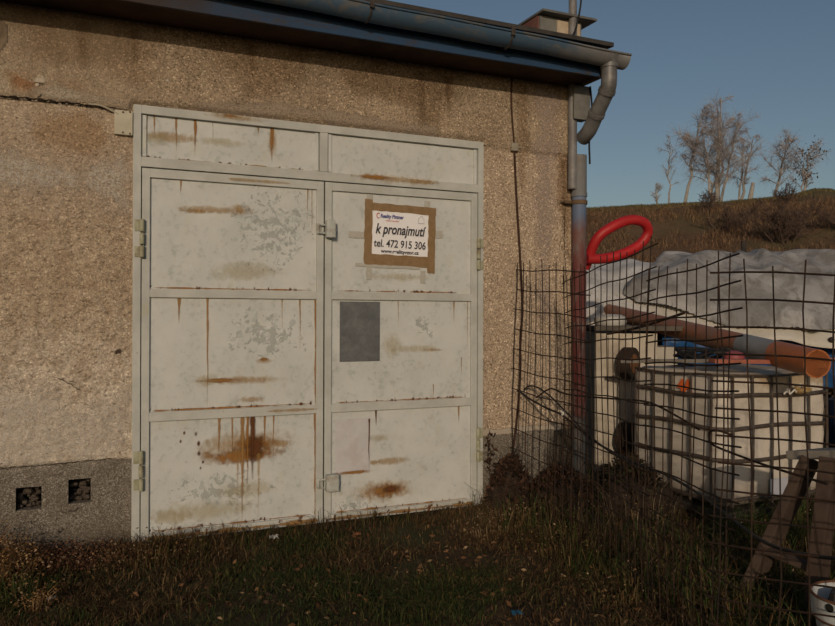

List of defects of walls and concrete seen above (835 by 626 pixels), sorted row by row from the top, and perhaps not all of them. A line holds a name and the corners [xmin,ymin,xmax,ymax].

crack [0,94,132,113]
peeling [241,192,313,273]
corrosion [150,286,296,366]
peeling [229,309,306,357]
corrosion [287,300,316,405]
corrosion [155,405,277,492]
corrosion [146,485,473,541]